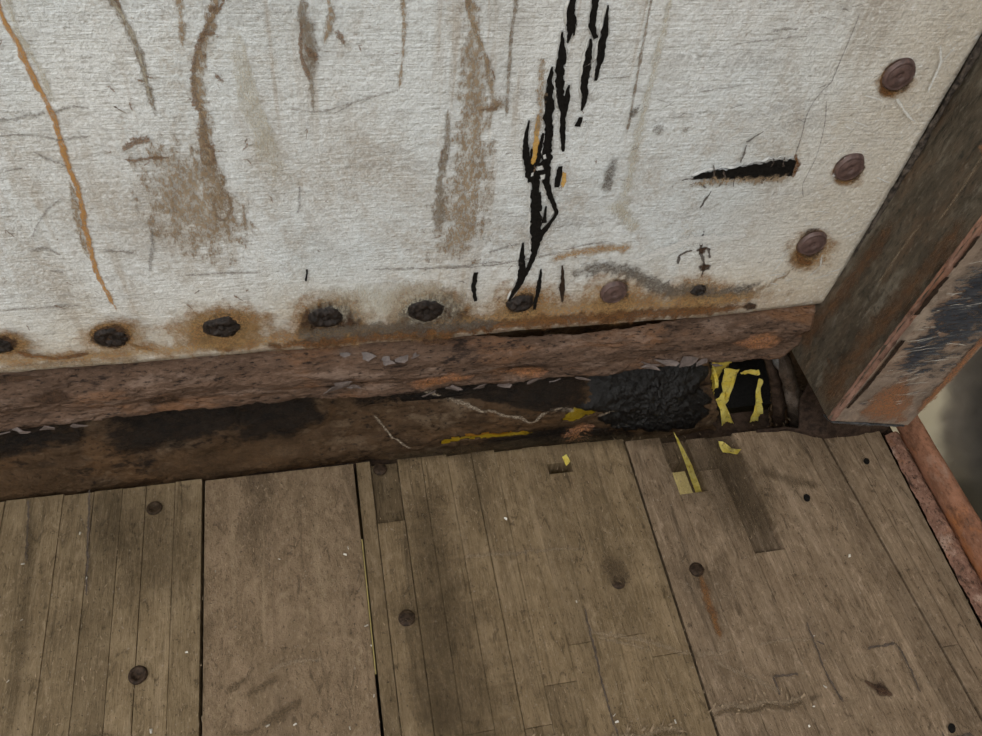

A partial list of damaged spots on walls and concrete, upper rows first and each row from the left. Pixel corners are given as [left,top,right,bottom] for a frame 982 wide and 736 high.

corrosion [878,59,913,97]
water stain [122,135,253,264]
corrosion [0,0,760,384]
water stain [422,0,518,264]
crack [507,0,610,310]
corrosion [144,395,179,405]
water stain [233,397,328,441]
corrosion [412,368,561,397]
corrosion [861,338,982,423]